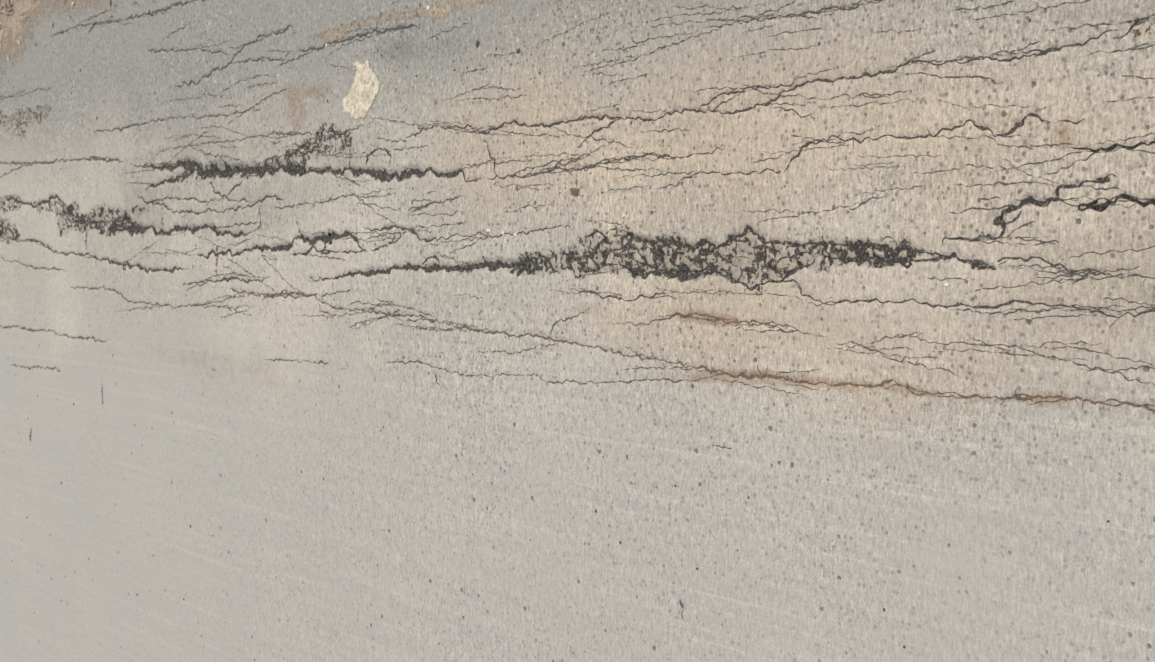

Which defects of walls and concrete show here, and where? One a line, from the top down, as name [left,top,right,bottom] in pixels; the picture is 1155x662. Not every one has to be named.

crack [0,0,1155,411]
spalling [505,226,996,294]